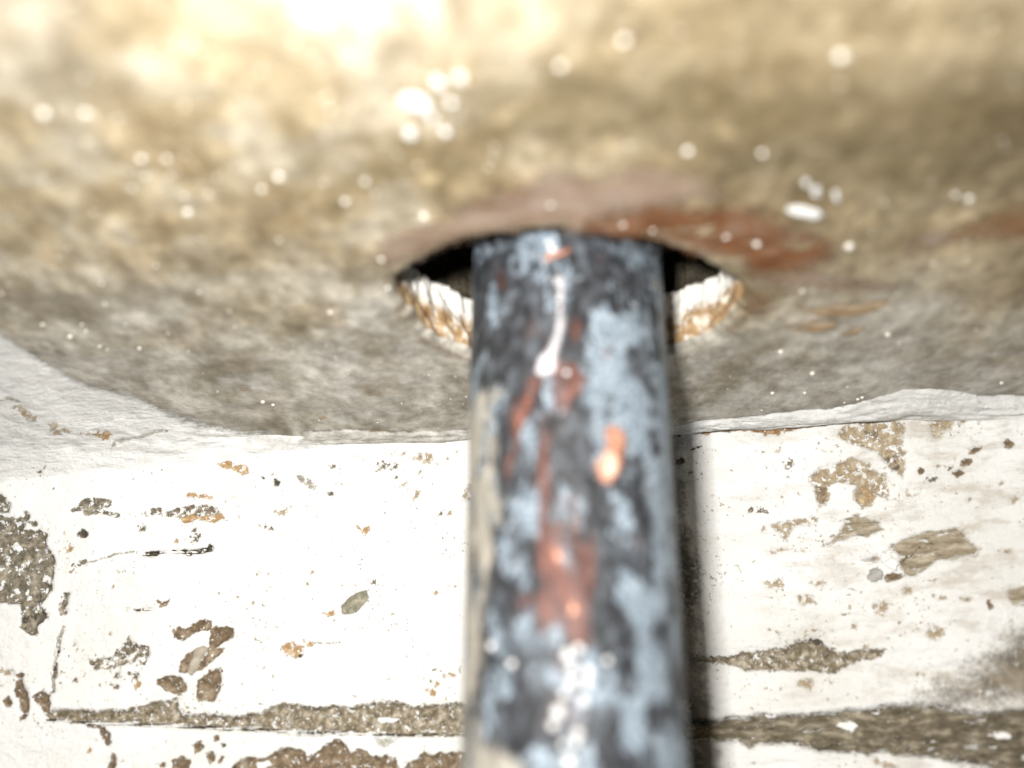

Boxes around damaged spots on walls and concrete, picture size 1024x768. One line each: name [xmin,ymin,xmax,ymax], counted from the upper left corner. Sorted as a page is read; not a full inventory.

rust [376,167,890,336]
spalling [71,497,120,518]
spalling [748,506,817,554]
spalling [811,421,906,542]
spalling [0,494,70,635]
spalling [867,528,979,594]
spalling [89,635,149,689]
spalling [156,619,234,702]
spalling [693,631,886,689]
peeling [926,627,945,640]
peeling [836,721,858,732]
peeling [988,731,1012,739]